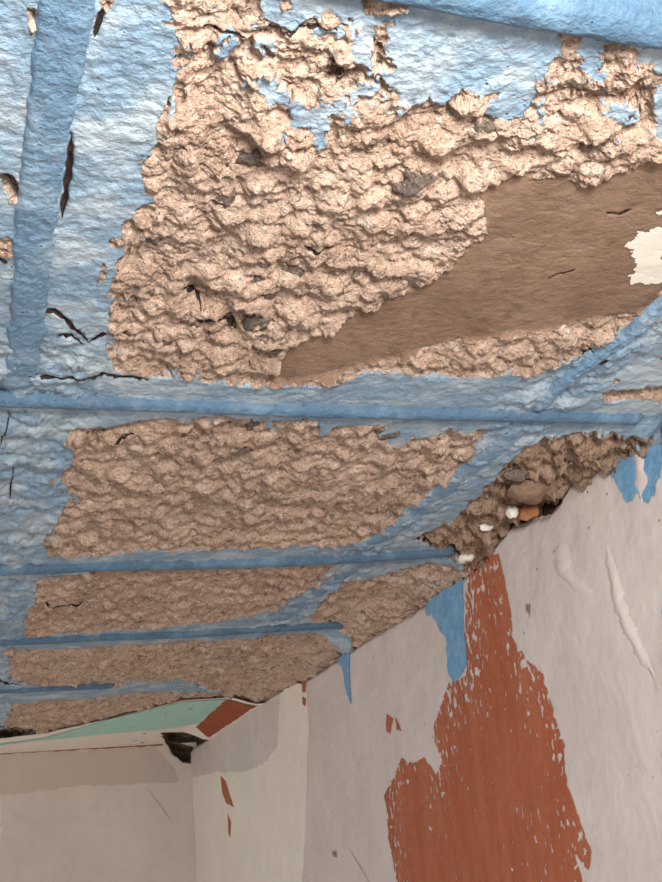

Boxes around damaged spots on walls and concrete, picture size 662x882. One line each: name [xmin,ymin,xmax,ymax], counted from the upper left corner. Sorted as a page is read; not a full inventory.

spalling [26,8,37,33]
crack [94,8,104,38]
spalling [3,178,19,204]
crack [60,135,73,218]
spalling [97,0,662,391]
spalling [0,237,14,259]
crack [45,308,130,345]
spalling [602,379,662,405]
peeling [0,415,653,882]